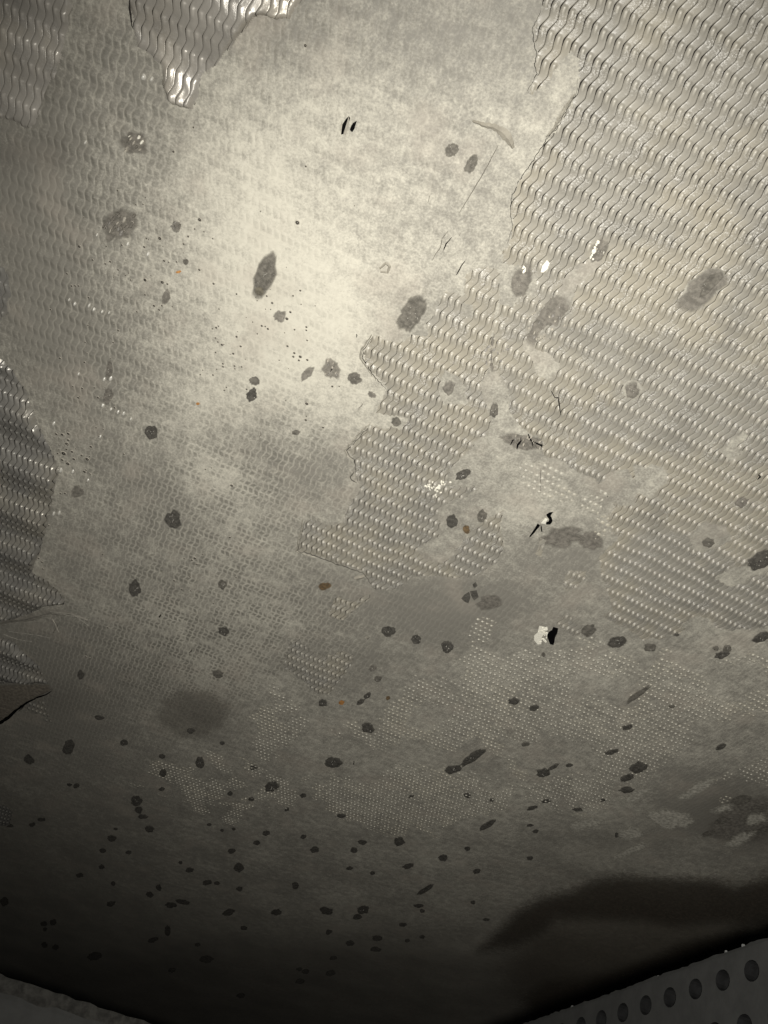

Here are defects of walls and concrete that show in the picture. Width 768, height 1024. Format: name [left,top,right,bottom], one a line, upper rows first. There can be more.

spalling [121,133,146,153]
peeling [507,79,578,243]
spalling [102,210,136,240]
spalling [526,297,569,343]
spalling [323,359,340,378]
peeling [359,335,384,387]
spalling [502,434,543,450]
flaking render [519,463,610,539]
crack [0,691,51,724]
flaking render [148,617,768,839]